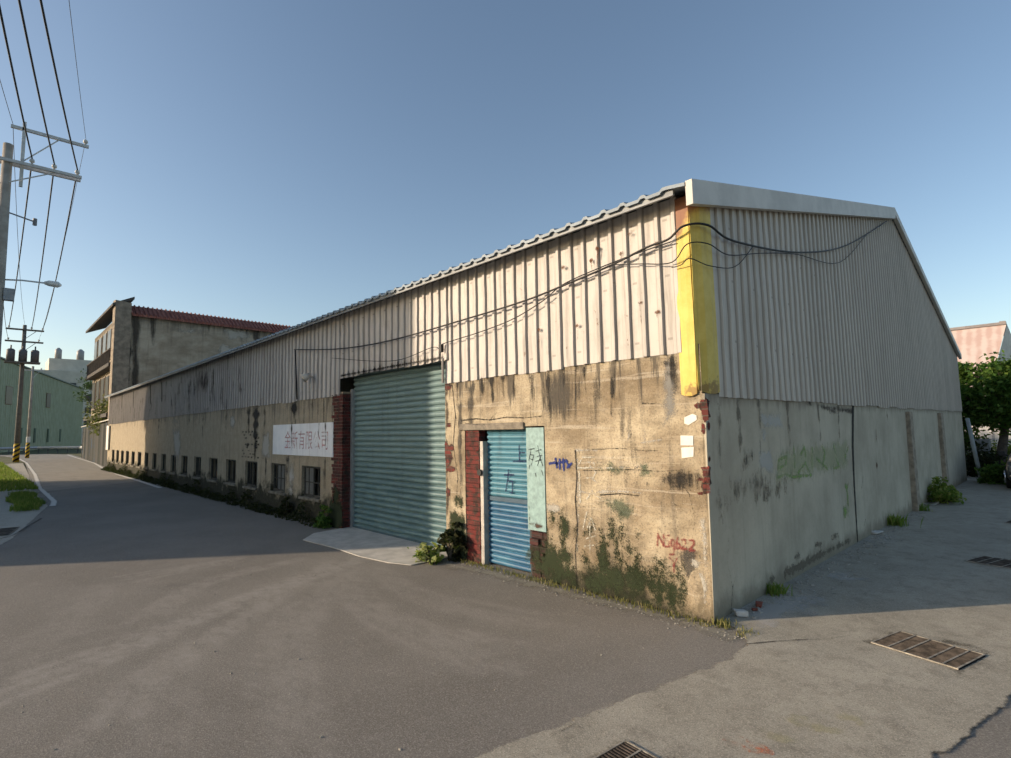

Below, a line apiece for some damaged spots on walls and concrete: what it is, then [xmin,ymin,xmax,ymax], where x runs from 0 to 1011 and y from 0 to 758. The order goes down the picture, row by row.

leakage [665,356,677,390]
leakage [529,366,615,420]
leakage [247,406,267,476]
leakage [456,374,515,494]
spalling [694,398,711,434]
leakage [667,472,698,490]
spalling [697,457,712,495]
leakage [680,550,697,578]